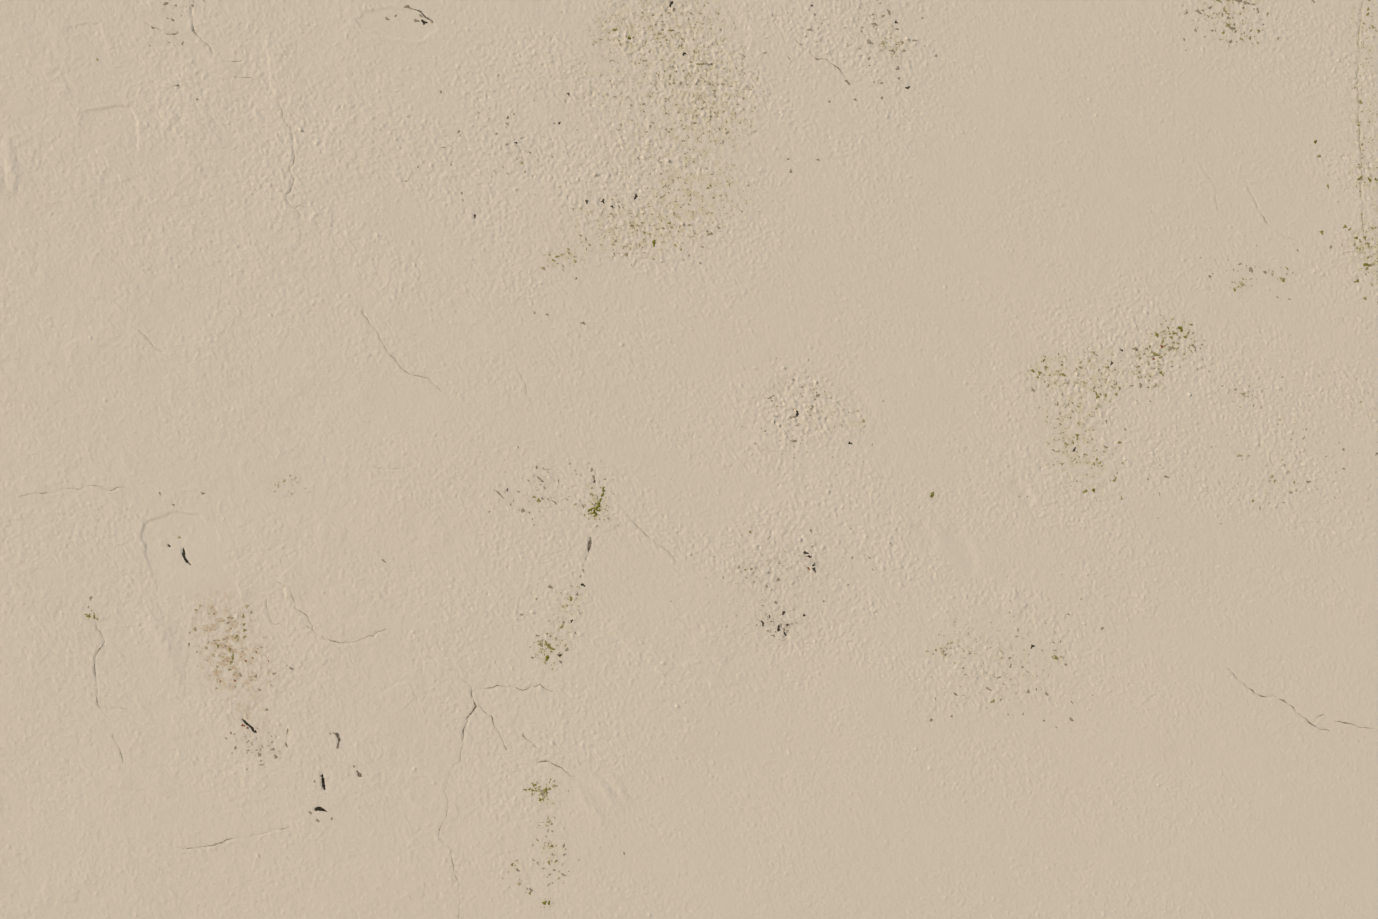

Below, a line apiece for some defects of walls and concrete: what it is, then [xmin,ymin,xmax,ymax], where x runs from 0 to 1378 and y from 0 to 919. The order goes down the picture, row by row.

damp [806,0,937,100]
damp [477,0,790,280]
damp [1016,309,1213,503]
damp [1147,354,1378,516]
damp [529,569,594,670]
crack [1227,668,1374,731]
crack [439,681,577,918]
damp [502,778,580,910]